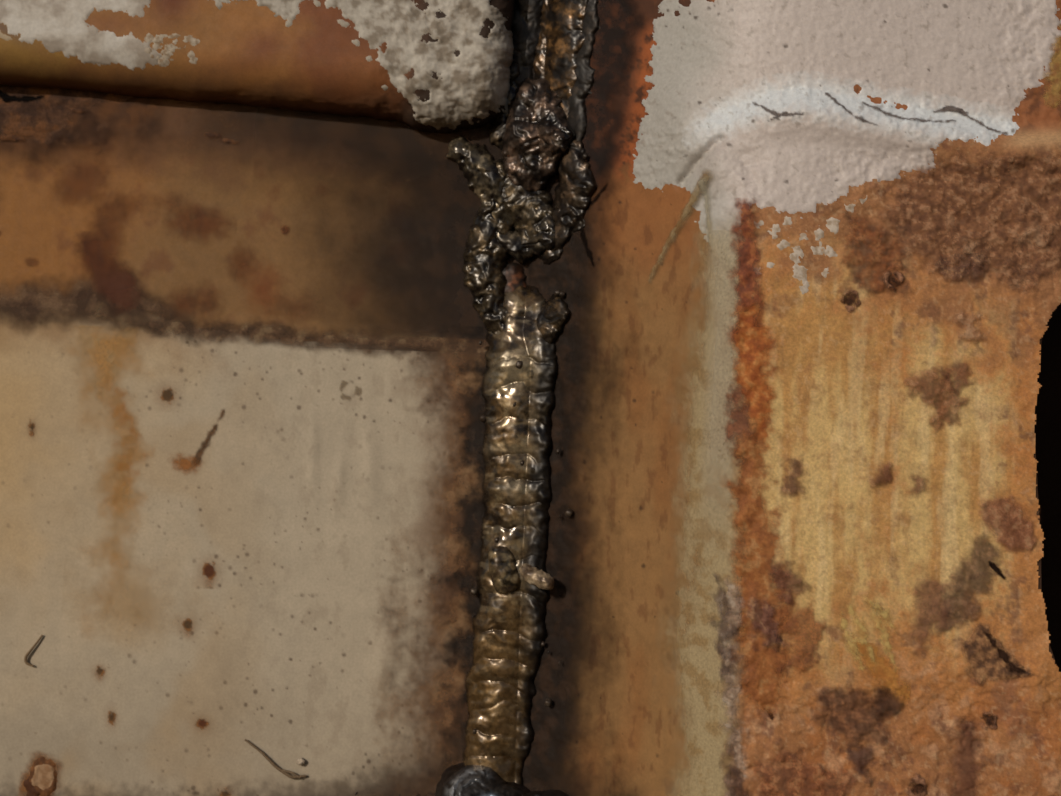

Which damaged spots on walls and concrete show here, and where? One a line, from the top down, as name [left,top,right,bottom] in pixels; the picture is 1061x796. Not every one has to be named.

peeling [0,0,200,71]
peeling [208,0,514,130]
corrosion [0,85,156,159]
crack [753,103,803,120]
peeling [633,0,1061,294]
crack [825,93,1007,135]
corrosion [725,202,793,711]
corrosion [782,460,801,494]
corrosion [874,465,892,484]
corrosion [20,754,59,796]
corrosion [724,767,748,796]
corrosion [954,725,976,796]